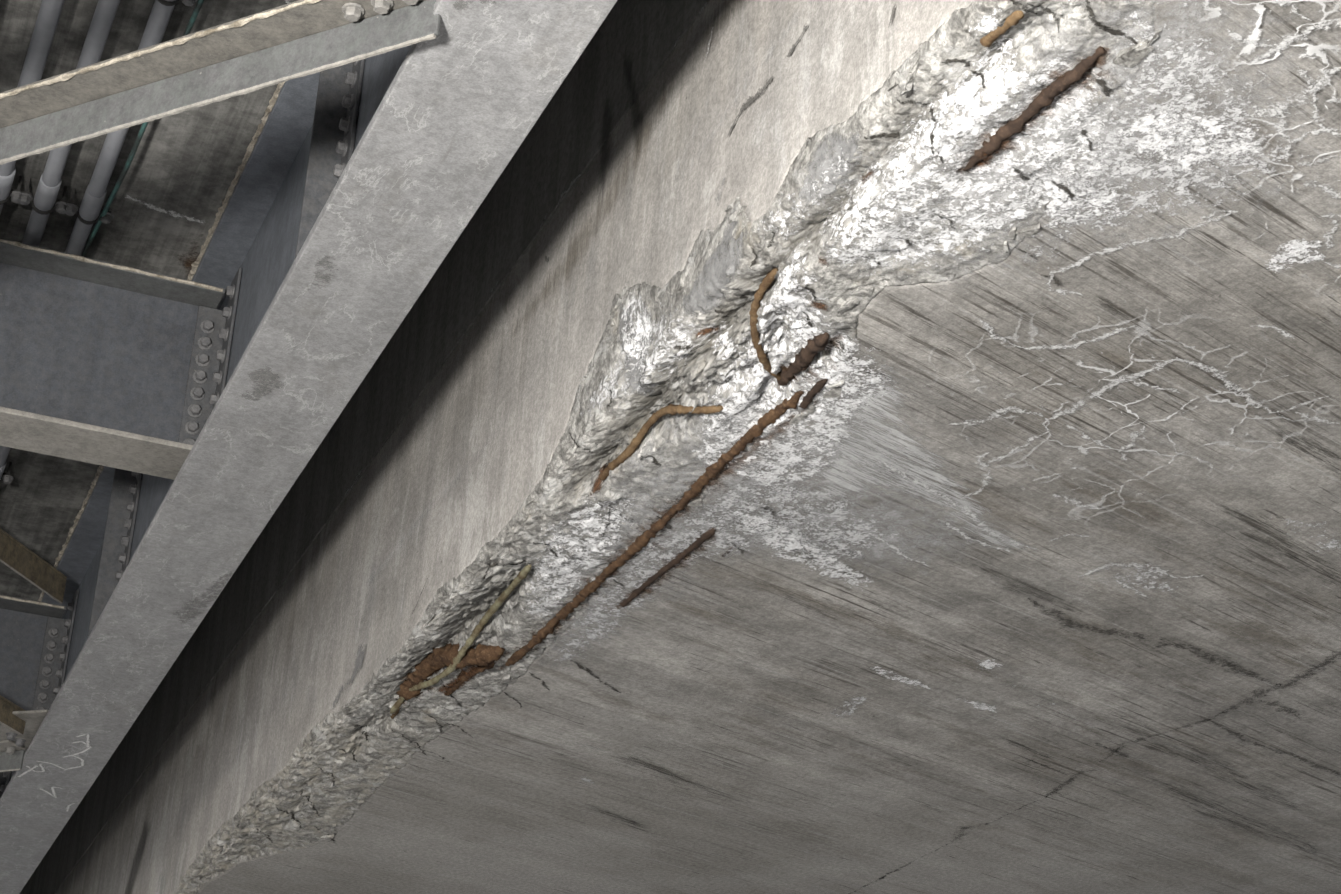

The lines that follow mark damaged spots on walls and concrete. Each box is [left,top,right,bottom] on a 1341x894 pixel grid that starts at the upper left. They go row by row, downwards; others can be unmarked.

rust [499,402,816,669]
spalling [174,0,1162,894]
leakage [518,0,1317,665]
crack [929,102,944,163]
rust [960,48,1109,174]
crack [1011,0,1138,45]
crack [879,320,1340,553]
crack [1047,210,1238,295]
crack [1211,0,1341,280]
leakage [1264,238,1327,273]
rust [421,665,481,696]
crack [848,601,1341,894]